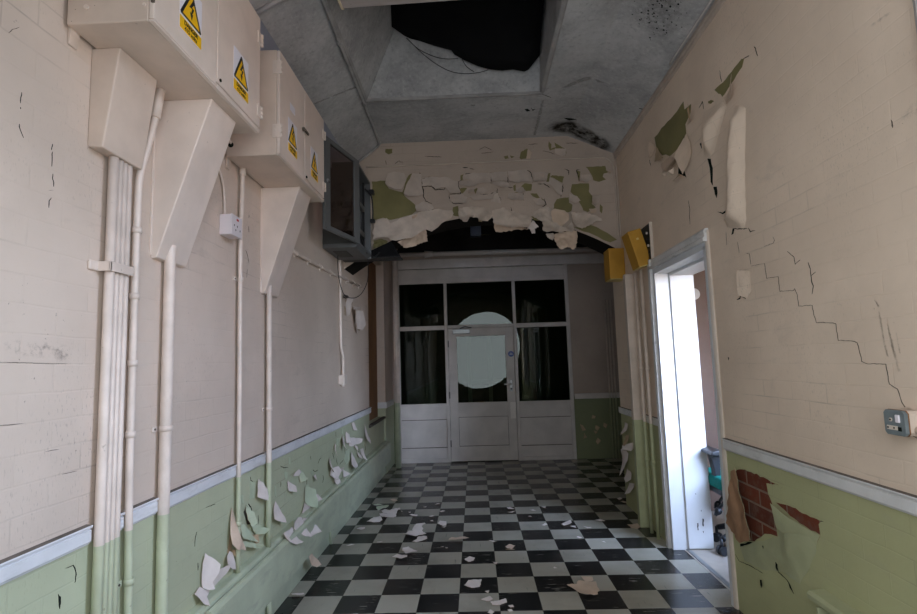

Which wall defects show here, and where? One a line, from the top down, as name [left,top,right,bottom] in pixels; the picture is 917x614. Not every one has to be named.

crack [726,238,905,407]
peeling [195,469,322,606]
peeling [329,422,371,485]
spalling [726,469,821,547]